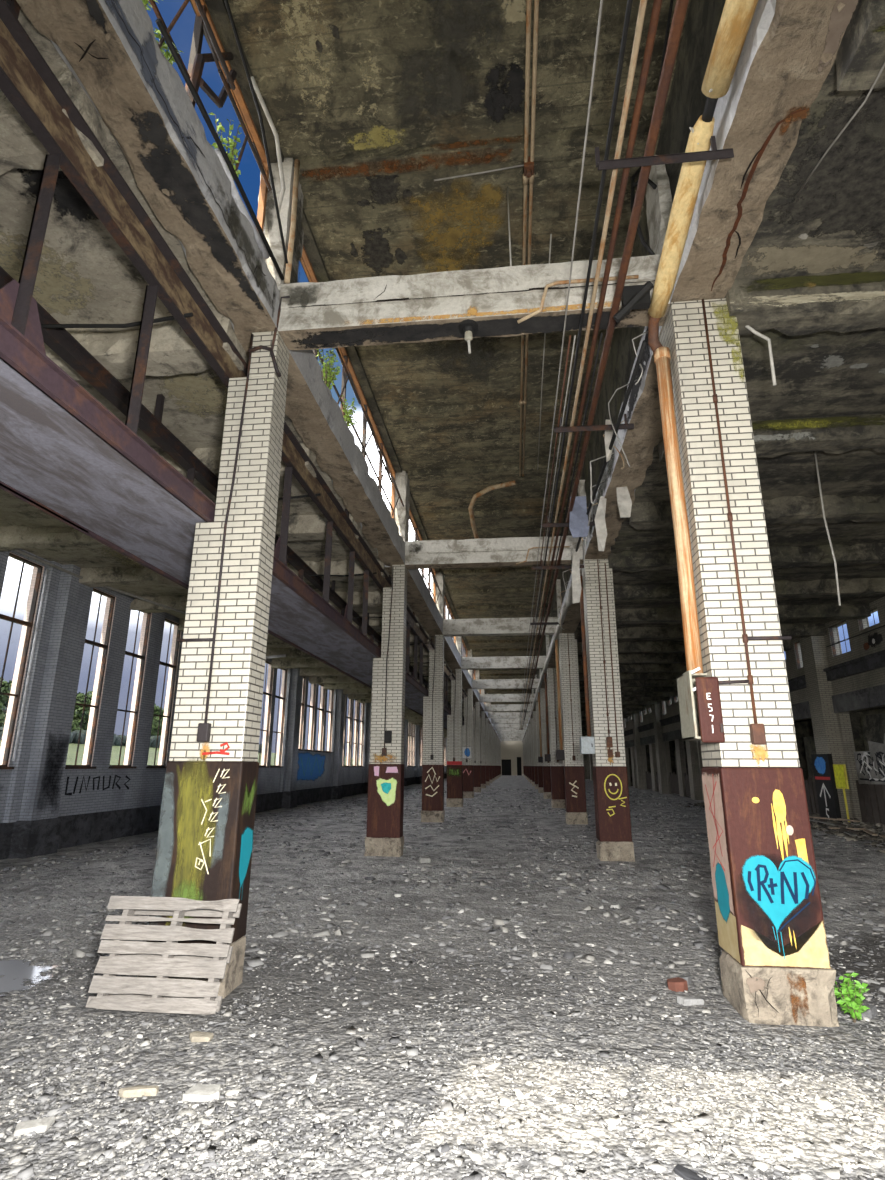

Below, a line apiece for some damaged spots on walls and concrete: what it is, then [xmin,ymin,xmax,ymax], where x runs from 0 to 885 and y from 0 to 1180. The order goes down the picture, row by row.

damp [346,0,525,150]
spalling [816,0,859,73]
damp [221,190,316,317]
damp [264,176,275,232]
corrosion [300,134,531,181]
damp [407,182,504,273]
crack [711,109,805,291]
damp [730,283,885,309]
peeling [745,87,885,276]